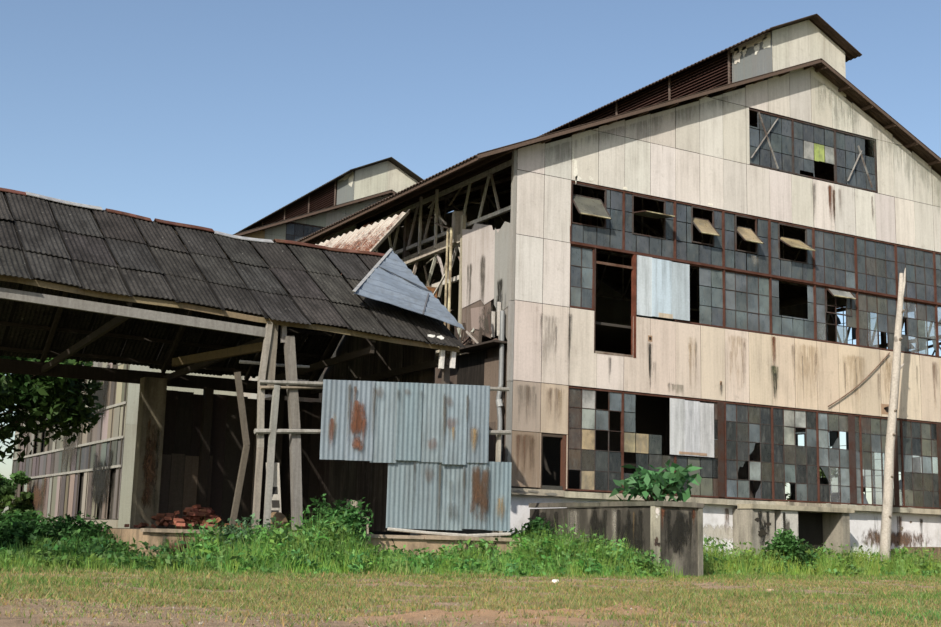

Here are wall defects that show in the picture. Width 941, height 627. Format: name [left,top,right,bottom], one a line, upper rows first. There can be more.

corrosion [348,384,376,451]
corrosion [463,467,502,514]
water stain [589,510,645,554]
water stain [664,508,733,553]
water stain [758,512,769,545]
water stain [865,516,923,547]